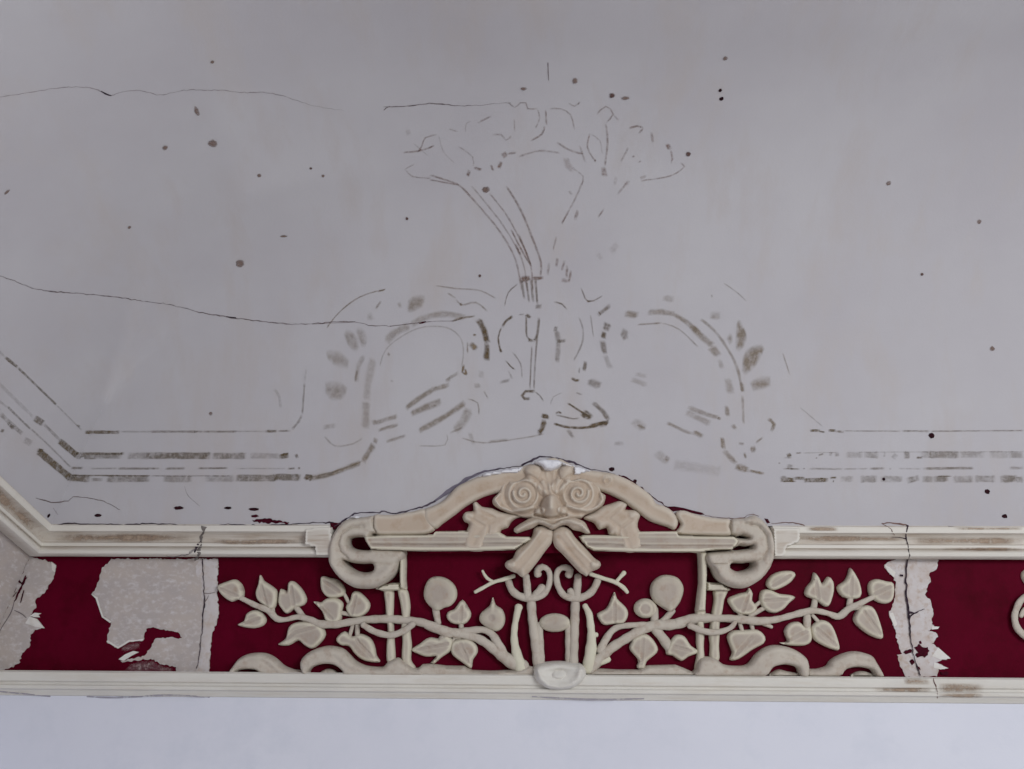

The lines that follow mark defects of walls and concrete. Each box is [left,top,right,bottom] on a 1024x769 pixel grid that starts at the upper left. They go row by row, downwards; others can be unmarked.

peeling [0,531,56,670]
peeling [92,558,219,672]
crack [36,456,805,668]
crack [882,522,938,698]
peeling [884,559,976,697]